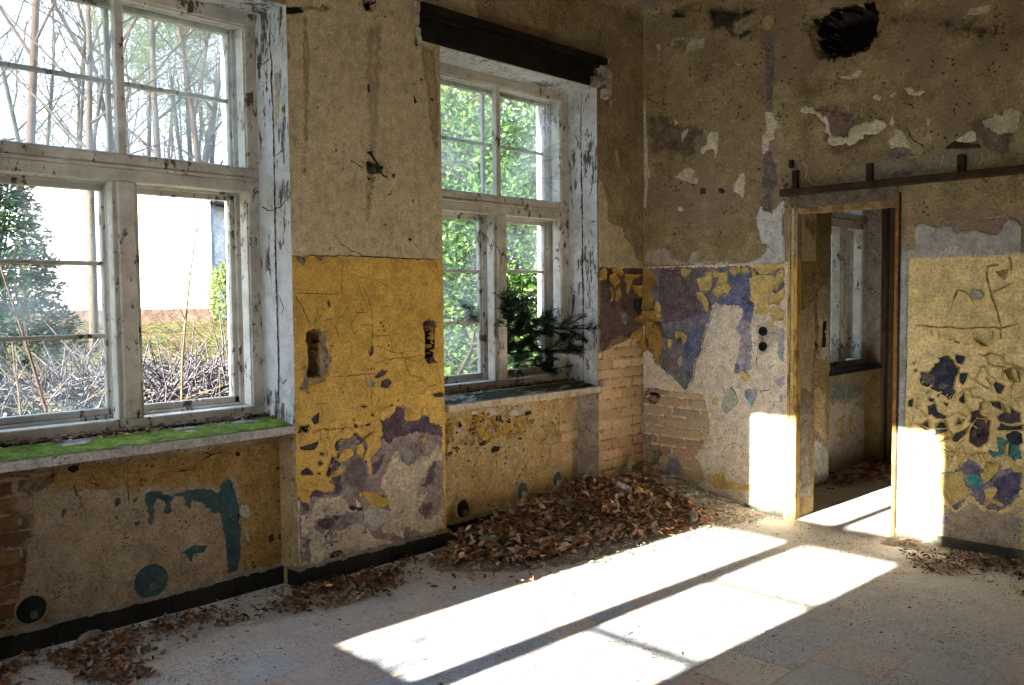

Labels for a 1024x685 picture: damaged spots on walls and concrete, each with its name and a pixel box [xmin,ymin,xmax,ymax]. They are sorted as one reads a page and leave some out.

spalling [804,2,880,59]
crack [259,22,443,491]
flaking render [0,470,54,630]
spalling [299,328,334,394]
peeling [297,390,561,566]
peeling [585,264,786,490]
peeling [902,354,1024,550]
crack [907,255,1024,468]